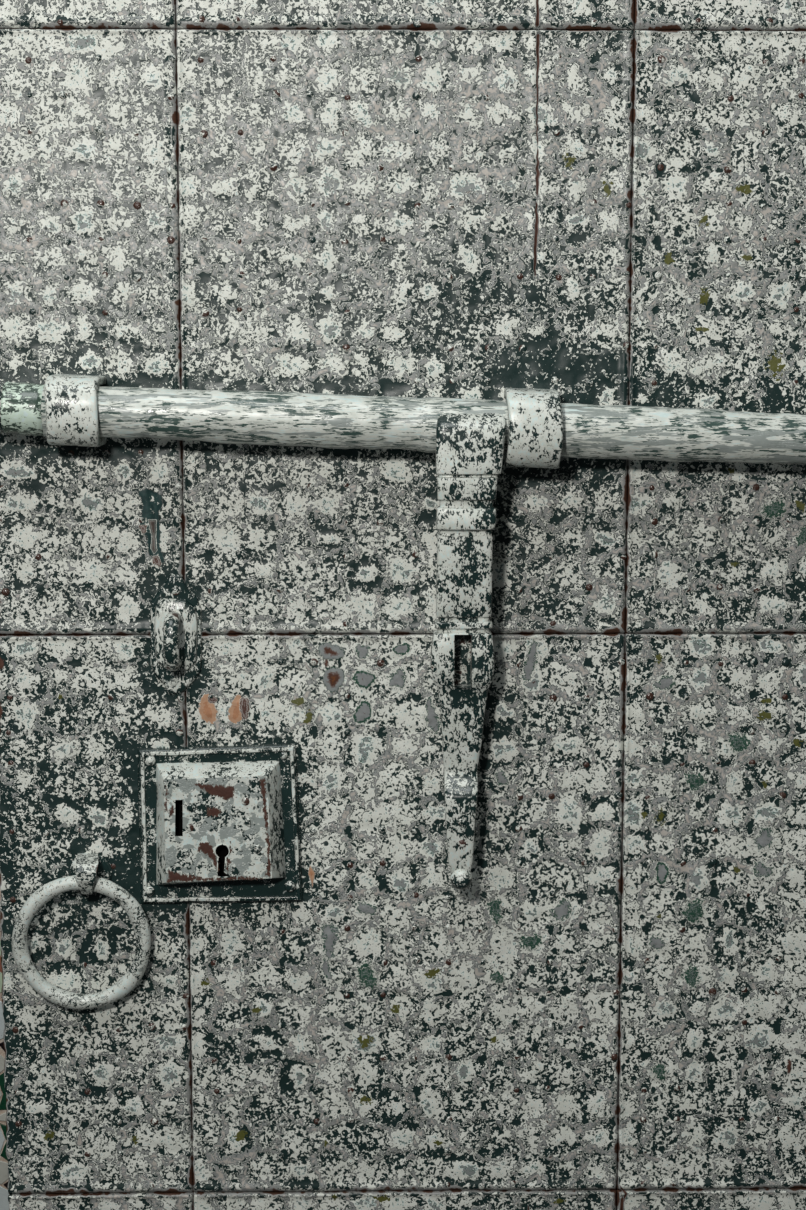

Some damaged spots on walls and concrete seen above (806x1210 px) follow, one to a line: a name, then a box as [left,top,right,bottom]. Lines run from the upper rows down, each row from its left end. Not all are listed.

rust [167,778,271,883]